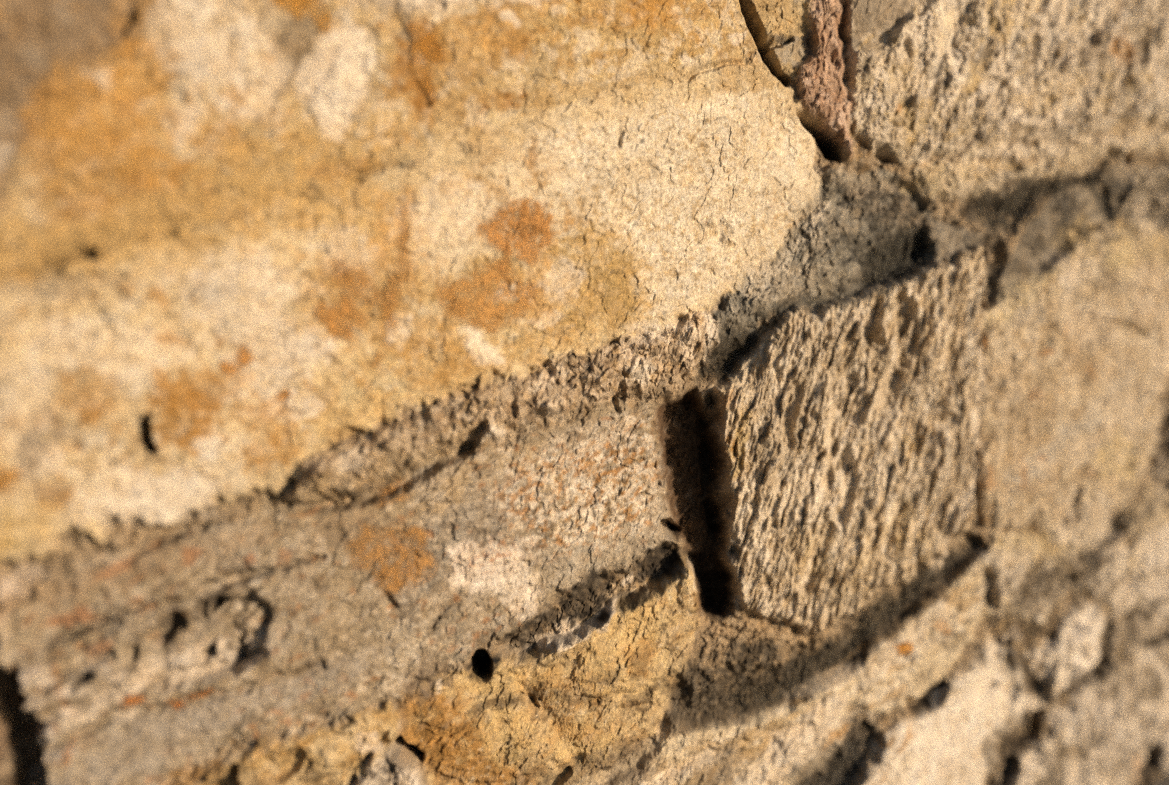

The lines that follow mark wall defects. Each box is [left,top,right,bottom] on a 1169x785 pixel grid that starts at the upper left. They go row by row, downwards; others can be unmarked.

crack [684,0,794,87]